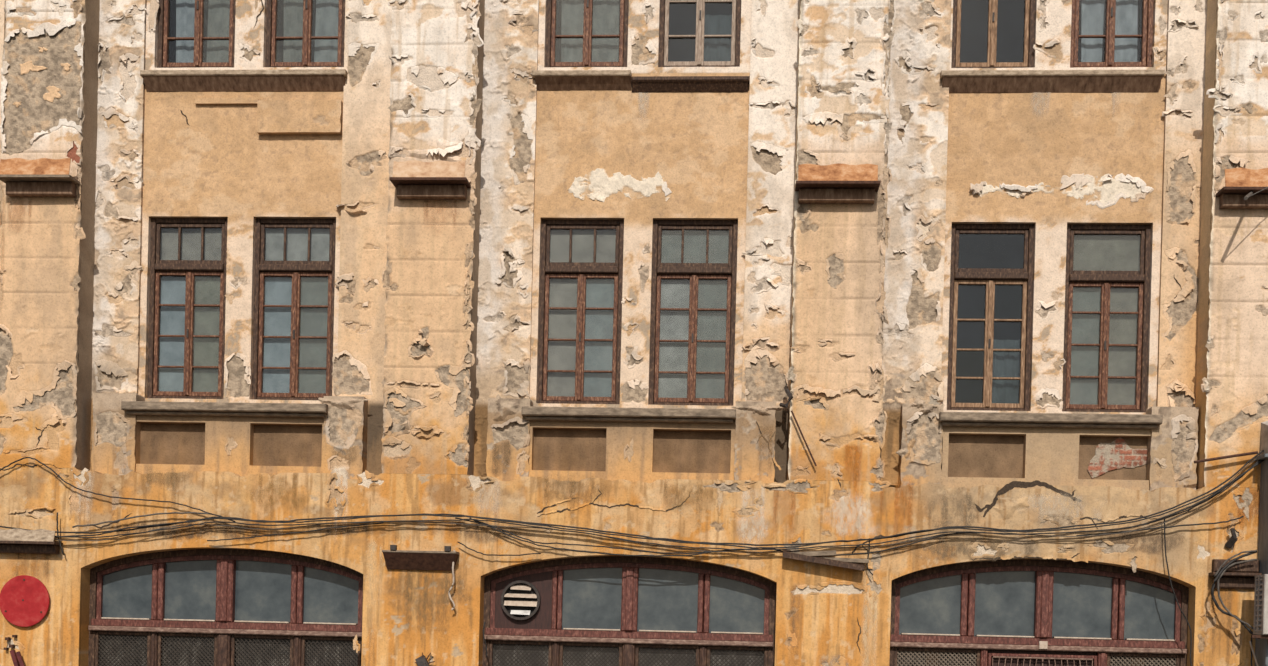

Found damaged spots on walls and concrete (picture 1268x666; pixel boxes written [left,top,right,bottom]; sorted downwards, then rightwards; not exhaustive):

flaking render [0,0,143,304]
peeling [98,0,159,132]
flaking render [748,0,943,344]
flaking render [1061,0,1268,225]
flaking render [0,324,77,457]
flaking render [741,141,891,500]
flaking render [1088,238,1268,482]
peeling [8,467,90,521]
crack [537,489,690,517]
flaking render [704,466,818,531]
crack [972,553,1089,563]
crack [975,480,1157,529]